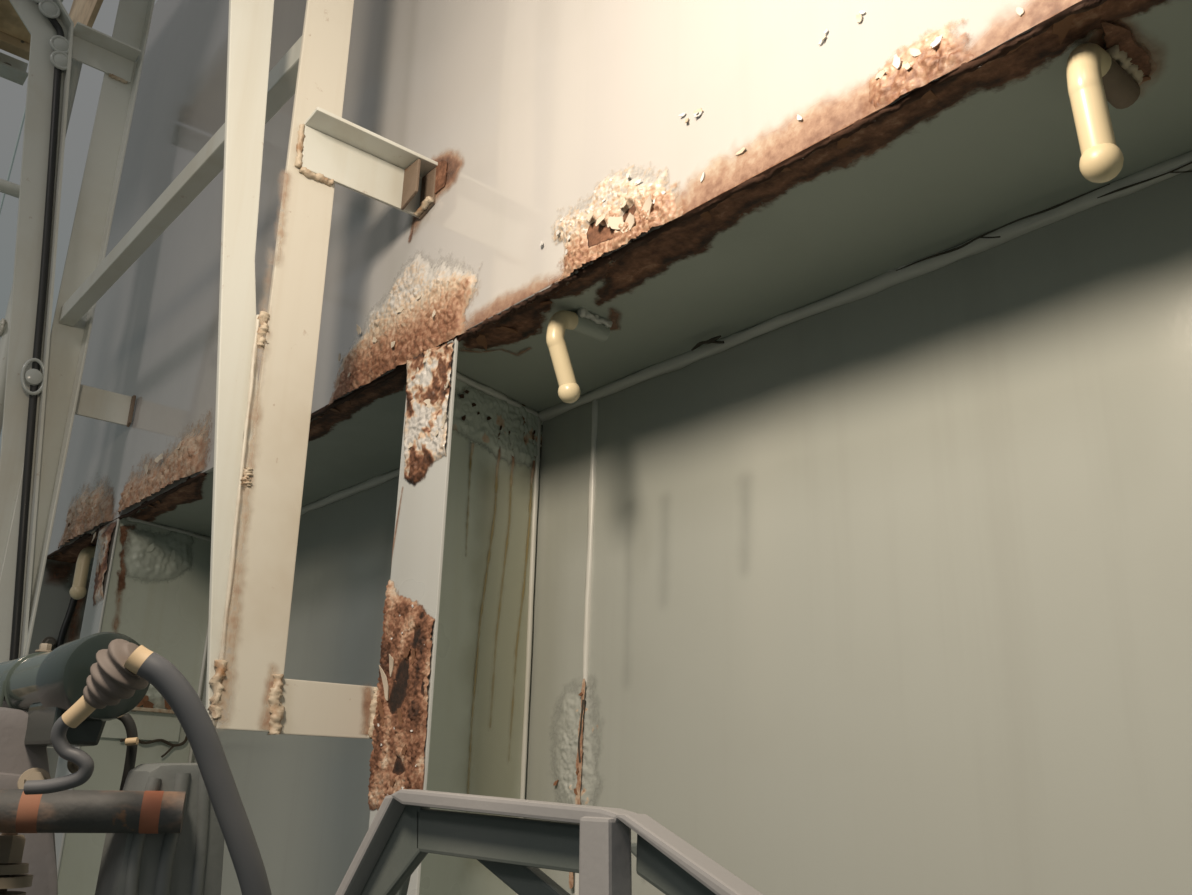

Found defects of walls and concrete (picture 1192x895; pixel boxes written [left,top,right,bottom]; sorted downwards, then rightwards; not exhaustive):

rust [949,0,1082,72]
rust [1088,19,1159,86]
rust [434,151,463,198]
rust [675,79,935,215]
spalling [540,165,684,282]
rust [465,264,588,330]
rust [217,488,248,723]
rust [262,674,274,730]
rust [363,580,435,810]